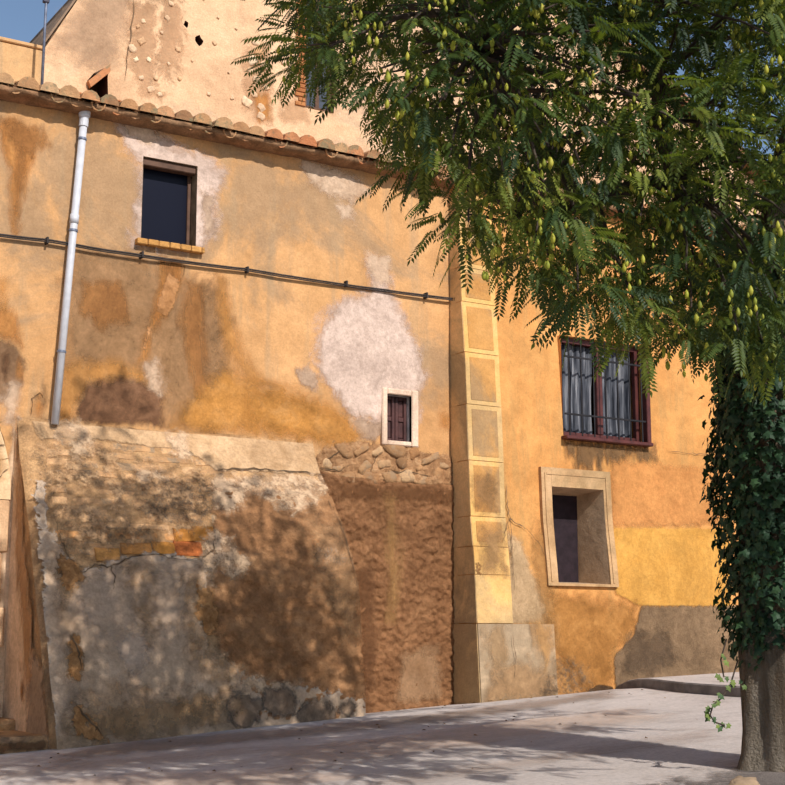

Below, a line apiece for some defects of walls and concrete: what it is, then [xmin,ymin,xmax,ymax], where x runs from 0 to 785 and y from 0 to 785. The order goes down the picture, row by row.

crack [125,1,134,76]
peeling [367,255,391,287]
leakage [54,251,358,459]
leakage [100,470,328,541]
crack [54,517,215,589]
spalling [66,633,85,681]